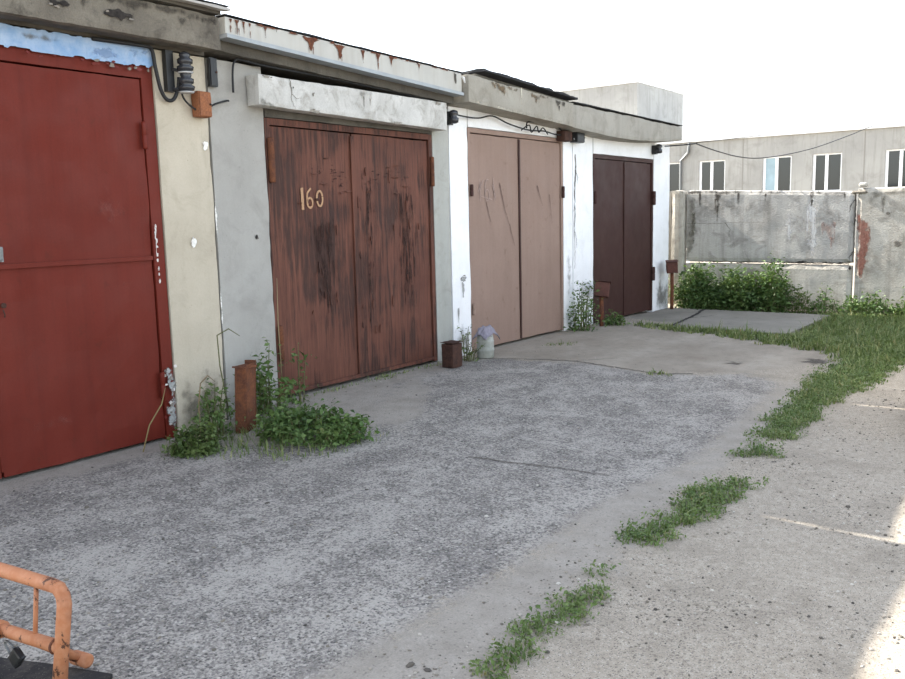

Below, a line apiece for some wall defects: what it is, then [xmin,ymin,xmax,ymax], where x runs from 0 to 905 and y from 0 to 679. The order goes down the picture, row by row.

spalling [104,9,134,21]
peeling [0,23,153,72]
corrosion [289,32,318,54]
damp [688,191,781,250]
damp [806,191,820,255]
crack [468,456,606,475]